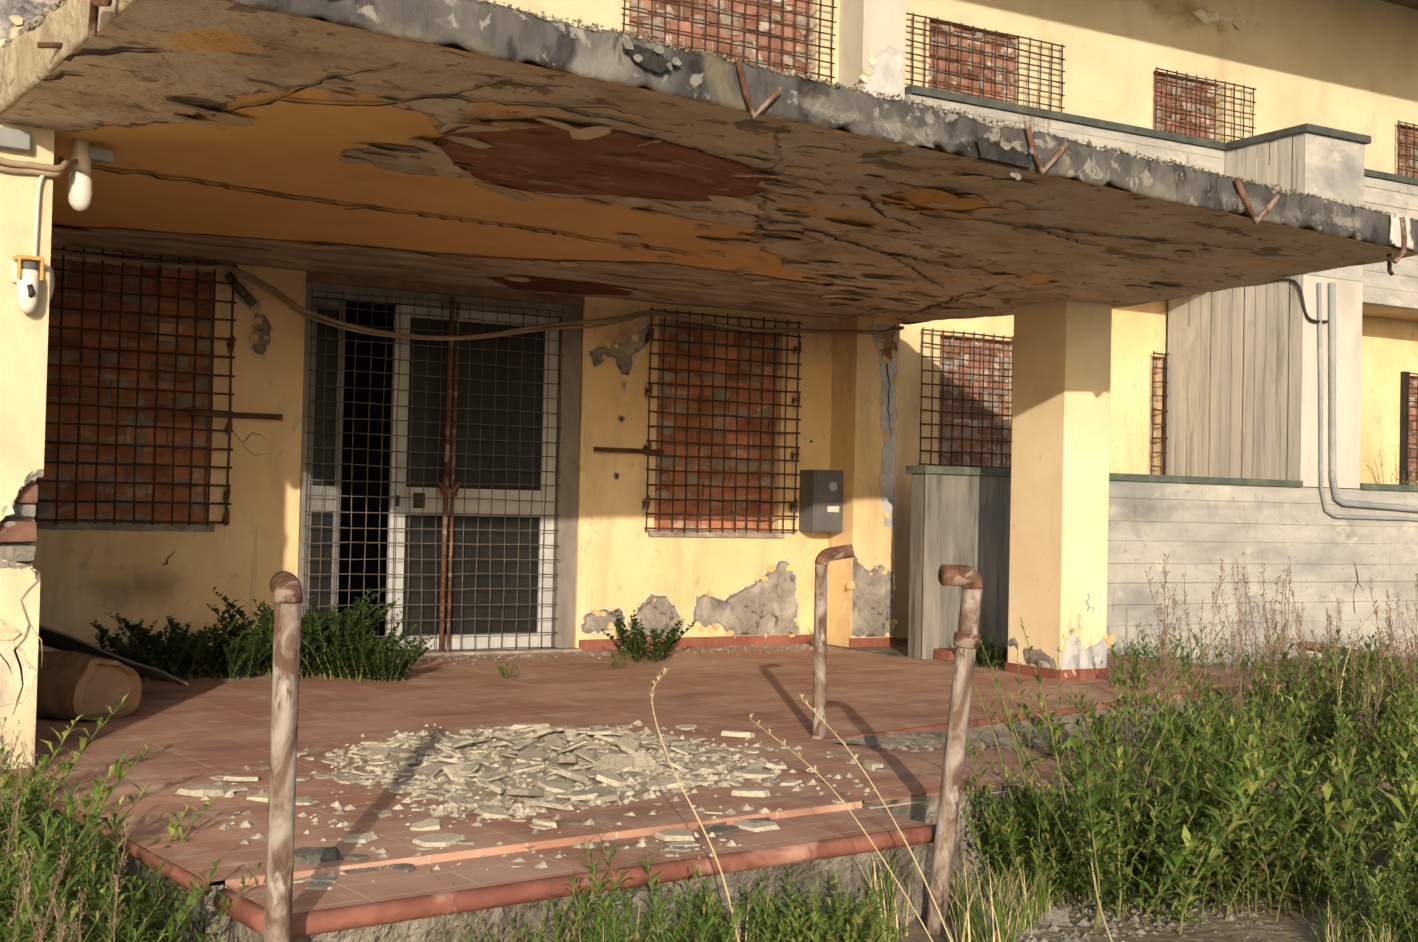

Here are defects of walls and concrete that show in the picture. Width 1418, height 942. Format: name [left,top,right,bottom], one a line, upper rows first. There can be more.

peeling [0,0,1418,529]
crack [737,191,1268,320]
spalling [0,469,44,581]
crack [0,580,43,715]
peeling [578,559,801,648]
peeling [846,553,897,637]
peeling [1008,627,1115,677]